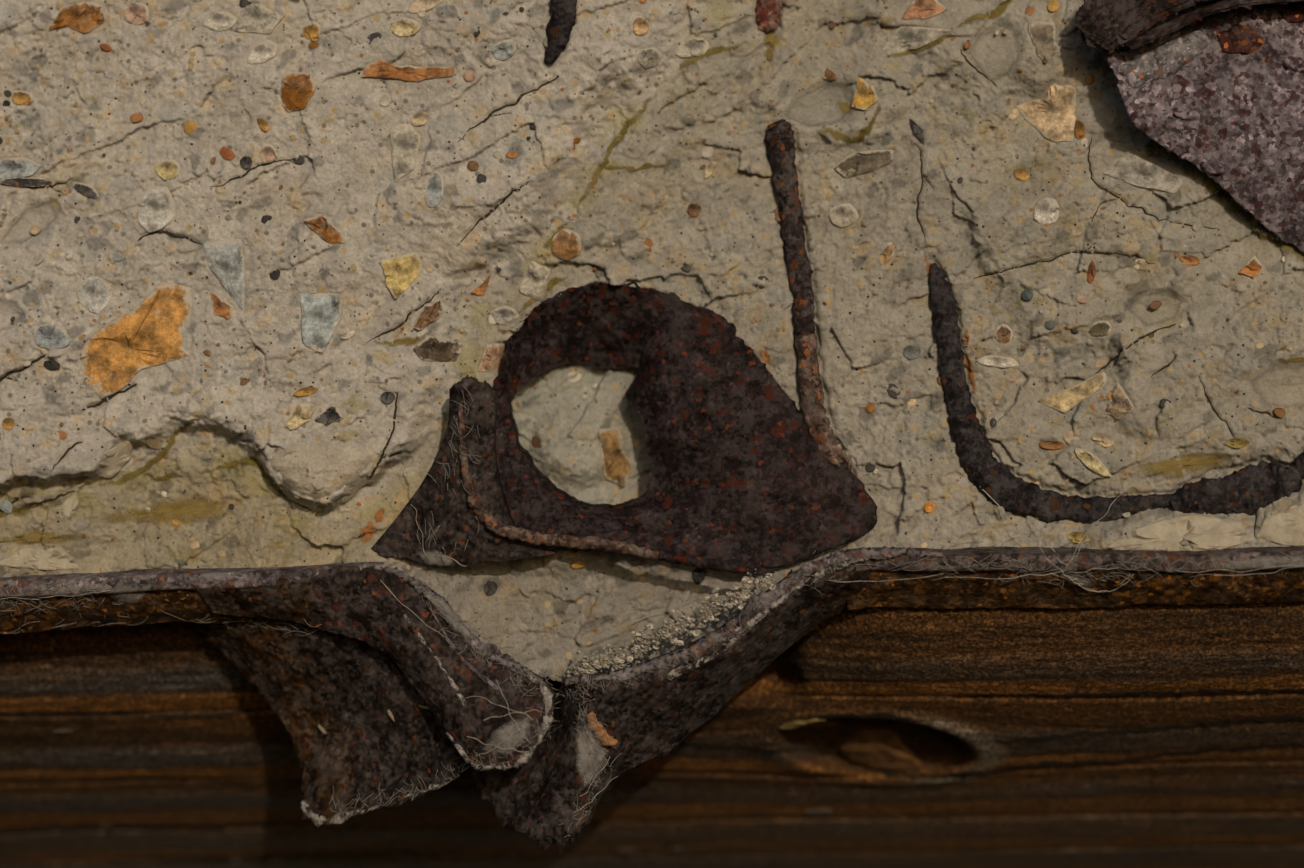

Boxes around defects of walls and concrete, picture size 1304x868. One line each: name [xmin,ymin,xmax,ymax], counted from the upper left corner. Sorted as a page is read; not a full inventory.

rust [1278,5,1304,23]
rust [1118,23,1264,88]
crack [457,76,559,143]
crack [138,231,203,245]
crack [974,137,1218,279]
crack [81,383,137,411]
rust [964,330,975,390]
crack [1095,324,1281,438]
crack [367,392,404,479]
peeling [53,493,80,518]
peeling [0,547,80,570]
rust [585,711,618,747]